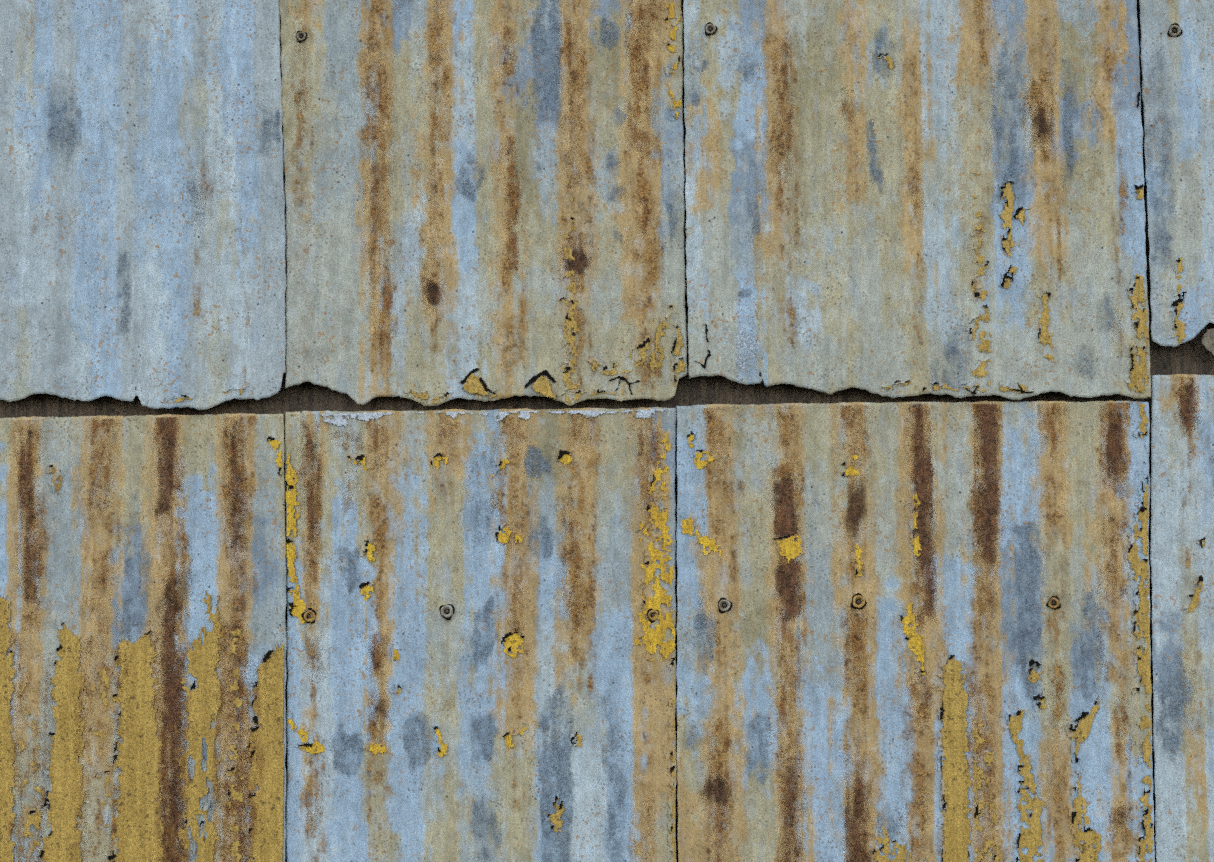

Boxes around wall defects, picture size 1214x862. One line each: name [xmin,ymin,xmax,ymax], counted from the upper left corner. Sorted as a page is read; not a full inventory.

rust [361,0,397,372]
rust [421,272,440,331]
peeling [404,216,686,422]
rust [624,0,663,389]
peeling [880,179,1031,393]
peeling [634,430,722,671]
rust [774,413,805,541]
rust [776,556,806,655]
rust [967,404,1001,563]
peeling [0,589,326,862]
peeling [899,602,1047,862]
peeling [1065,695,1101,862]